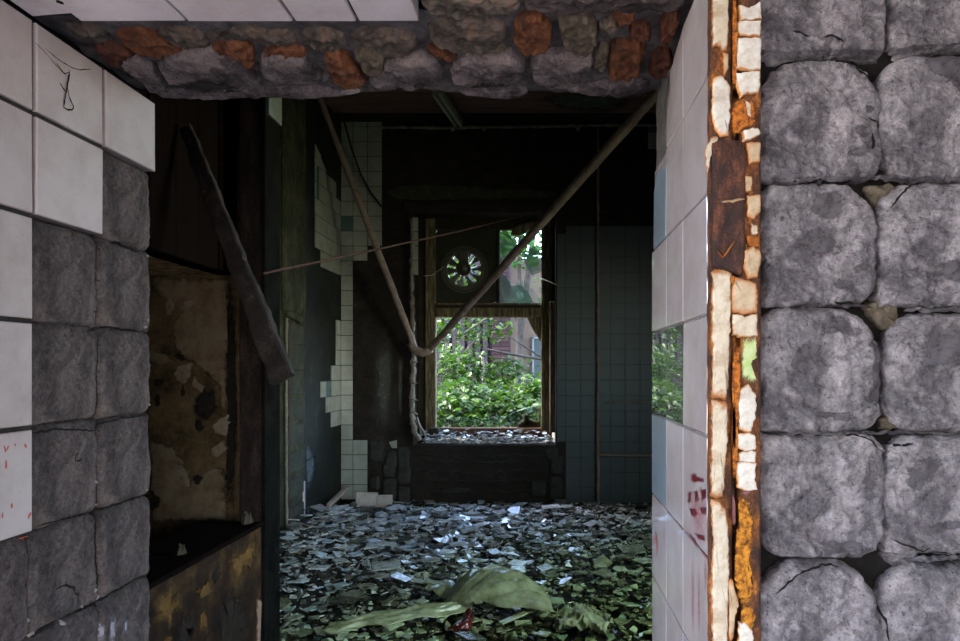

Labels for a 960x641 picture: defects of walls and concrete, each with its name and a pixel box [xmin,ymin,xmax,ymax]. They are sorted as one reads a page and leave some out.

spalling [27,0,694,324]
corrosion [731,99,756,134]
water stain [180,288,237,502]
corrosion [732,349,741,475]
water stain [149,491,160,511]
corrosion [734,498,756,629]
crack [776,563,838,594]
crack [876,602,890,641]